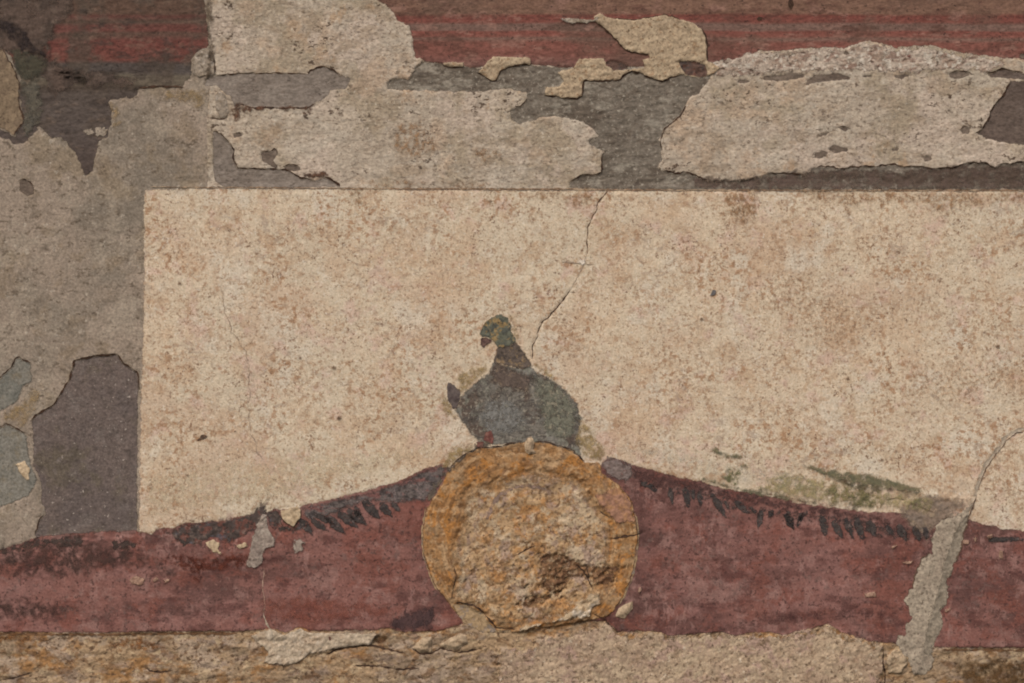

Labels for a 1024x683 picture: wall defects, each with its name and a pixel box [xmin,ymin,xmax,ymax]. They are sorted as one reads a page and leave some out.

peeling [213,130,340,188]
peeling [205,66,350,109]
peeling [387,42,1024,190]
crack [152,186,1024,357]
peeling [0,354,139,555]
peeling [166,502,305,554]
peeling [887,496,963,534]
crack [882,428,1024,683]